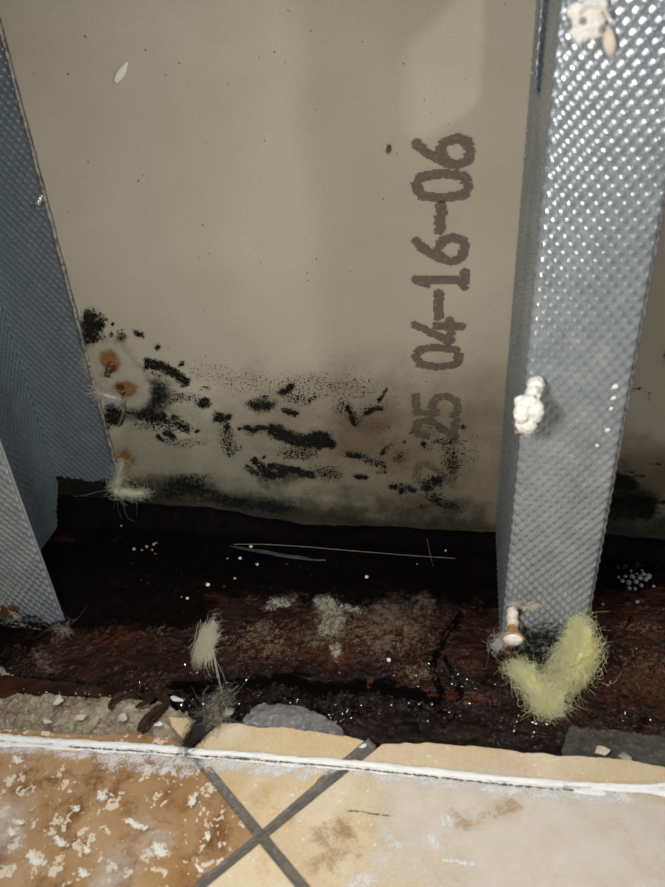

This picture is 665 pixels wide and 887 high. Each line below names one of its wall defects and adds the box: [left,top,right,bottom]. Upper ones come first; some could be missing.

mould [77,307,144,347]
damp [56,343,496,532]
damp [605,469,665,540]
rust [0,606,67,631]
crack [166,612,465,705]
rust [216,605,460,700]
rust [587,617,665,716]
rust [108,689,170,732]
damp [98,754,310,781]